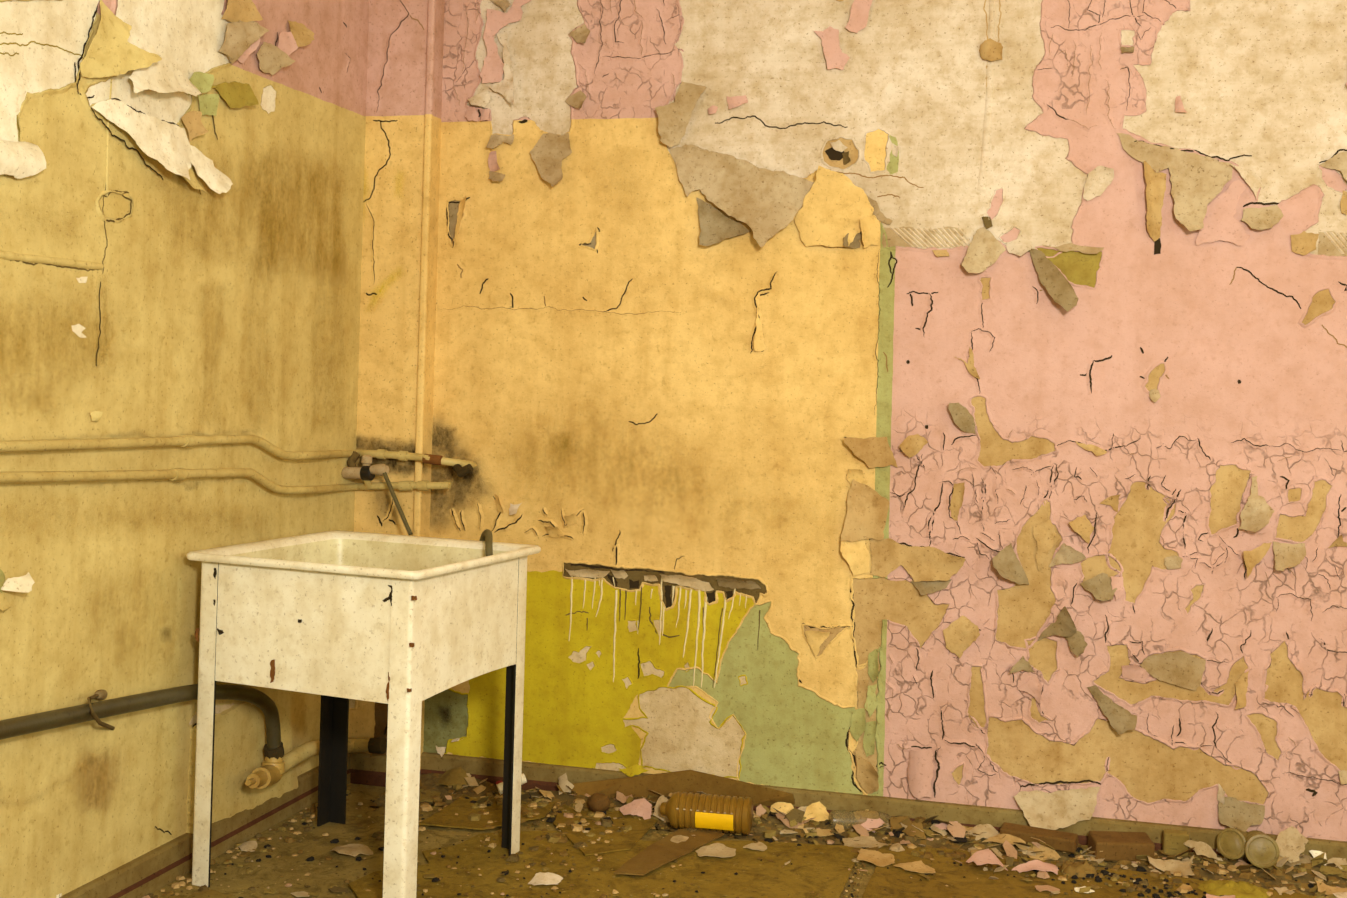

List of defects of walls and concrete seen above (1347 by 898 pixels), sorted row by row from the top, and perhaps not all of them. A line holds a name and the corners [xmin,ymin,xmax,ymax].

peeling [0,0,315,195]
peeling [464,0,590,187]
crack [577,0,684,102]
leakage [356,432,473,520]
peeling [655,0,1347,875]
crack [889,428,1347,666]
peeling [567,645,603,671]
flaking render [594,659,747,778]
crack [878,647,986,770]
crack [1143,710,1241,770]
crack [1260,684,1347,797]